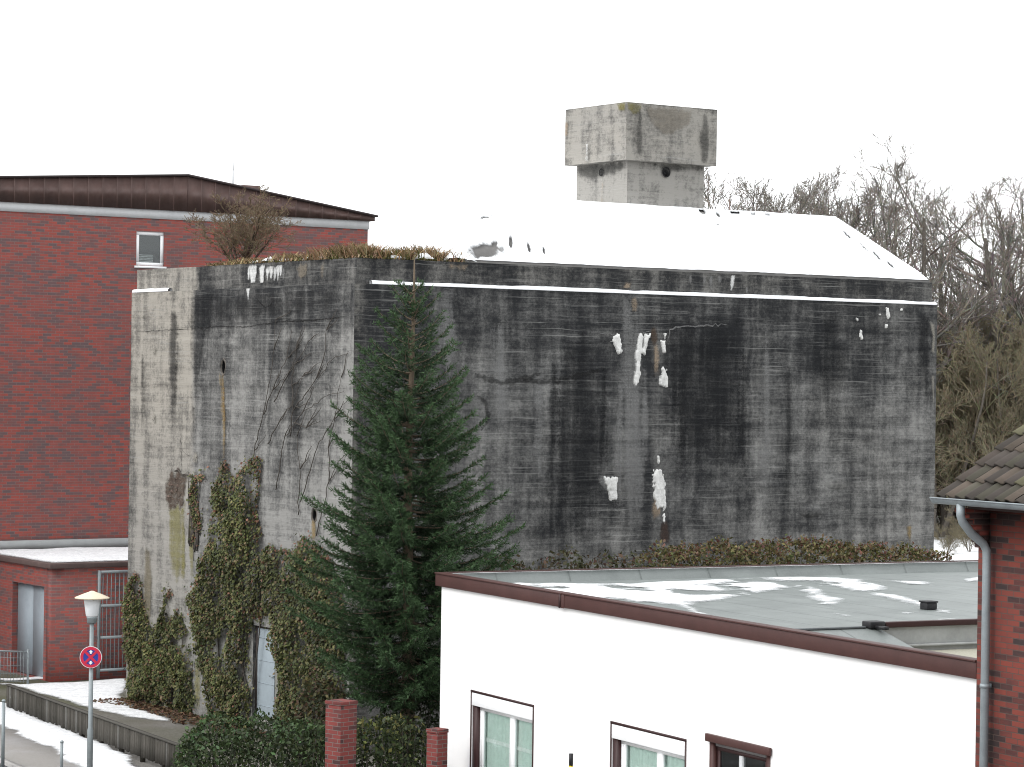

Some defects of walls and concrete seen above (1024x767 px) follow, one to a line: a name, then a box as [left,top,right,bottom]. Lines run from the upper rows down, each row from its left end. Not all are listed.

leakage [195,296,211,380]
leakage [247,265,284,297]
leakage [534,305,651,517]
leakage [670,327,746,457]